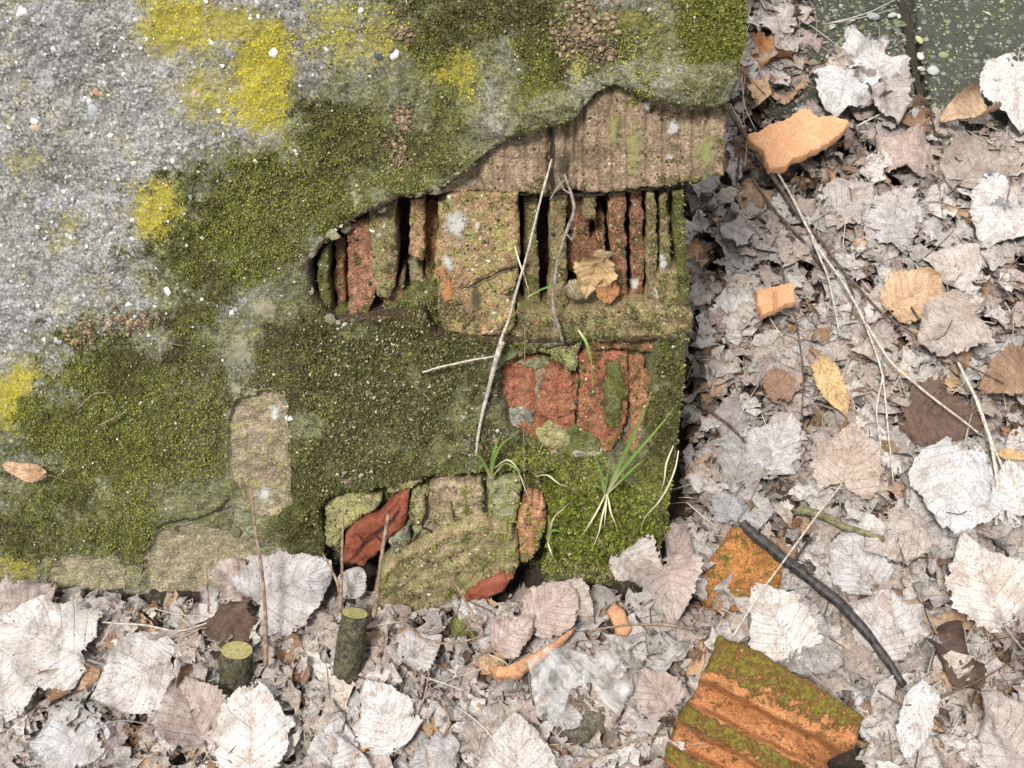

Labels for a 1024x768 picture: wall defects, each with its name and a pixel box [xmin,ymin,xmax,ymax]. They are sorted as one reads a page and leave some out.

spalling [302,185,680,454]
spalling [344,488,410,567]
spalling [463,571,514,602]